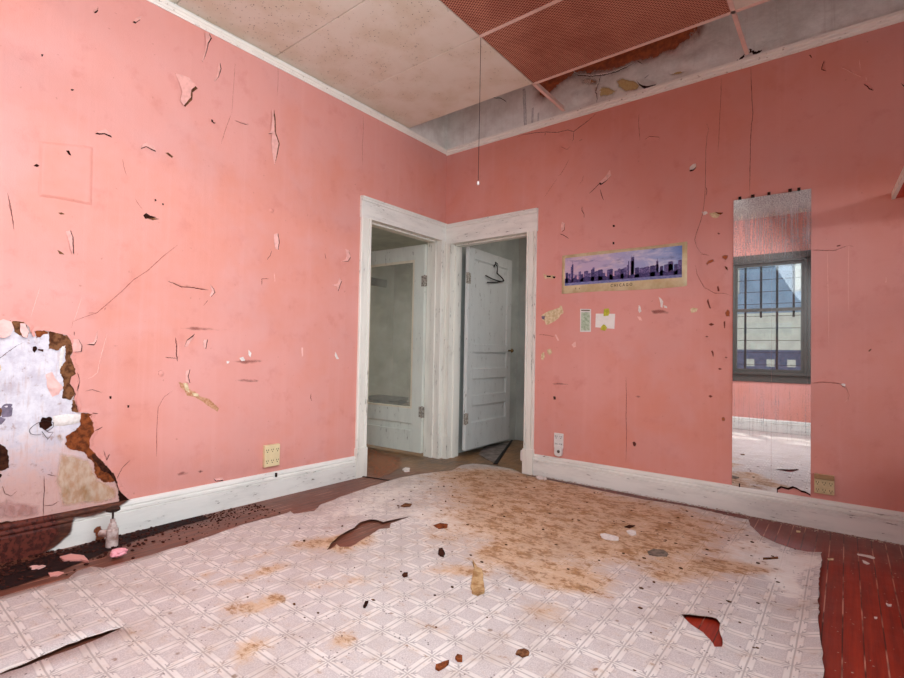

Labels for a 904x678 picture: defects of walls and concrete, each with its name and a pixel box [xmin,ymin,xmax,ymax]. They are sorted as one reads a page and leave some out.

peeling [175,73,198,107]
peeling [269,111,280,165]
peeling [58,230,74,255]
crack [71,245,208,328]
crack [167,338,181,361]
flaking render [0,317,129,524]